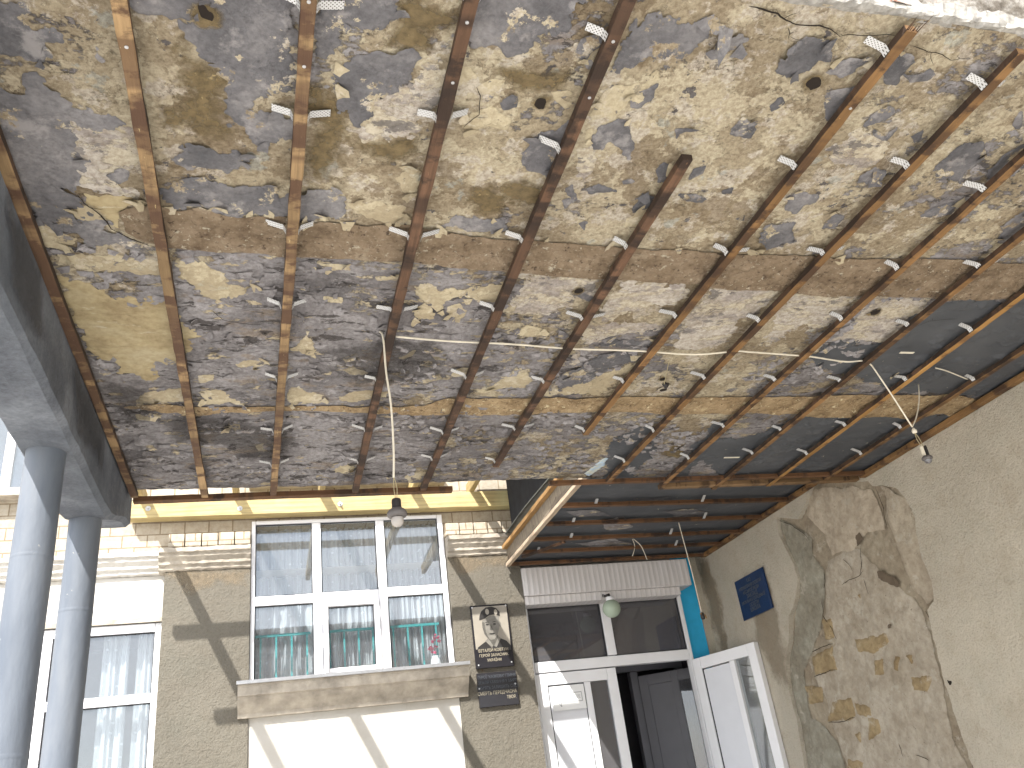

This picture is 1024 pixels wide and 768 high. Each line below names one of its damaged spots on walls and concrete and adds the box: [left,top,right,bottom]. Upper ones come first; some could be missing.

water stain [163,36,230,135]
peeling [314,0,446,143]
peeling [458,66,518,138]
peeling [469,0,586,58]
peeling [521,90,572,177]
peeling [562,11,749,209]
peeling [775,36,874,121]
crack [750,6,964,65]
peeling [0,0,298,489]
spalling [294,166,421,315]
water stain [468,180,541,216]
spalling [280,191,1024,768]